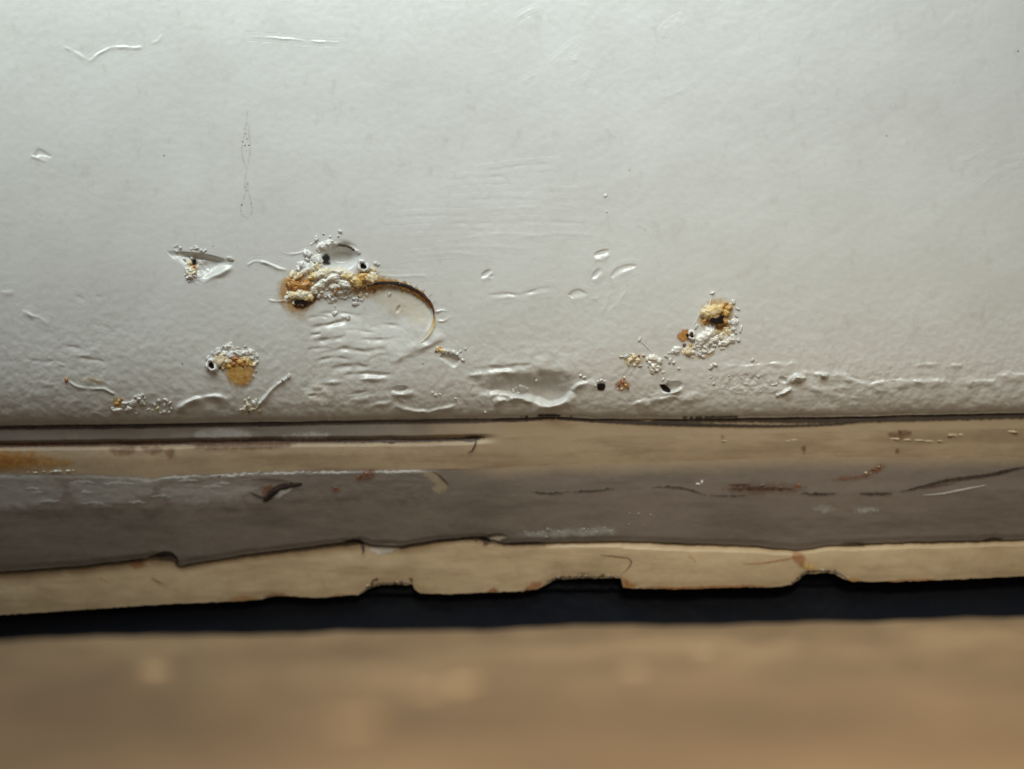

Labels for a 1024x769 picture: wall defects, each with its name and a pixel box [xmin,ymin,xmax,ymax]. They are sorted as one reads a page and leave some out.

peeling [359,577,423,596]
peeling [537,573,635,592]
peeling [788,569,859,586]